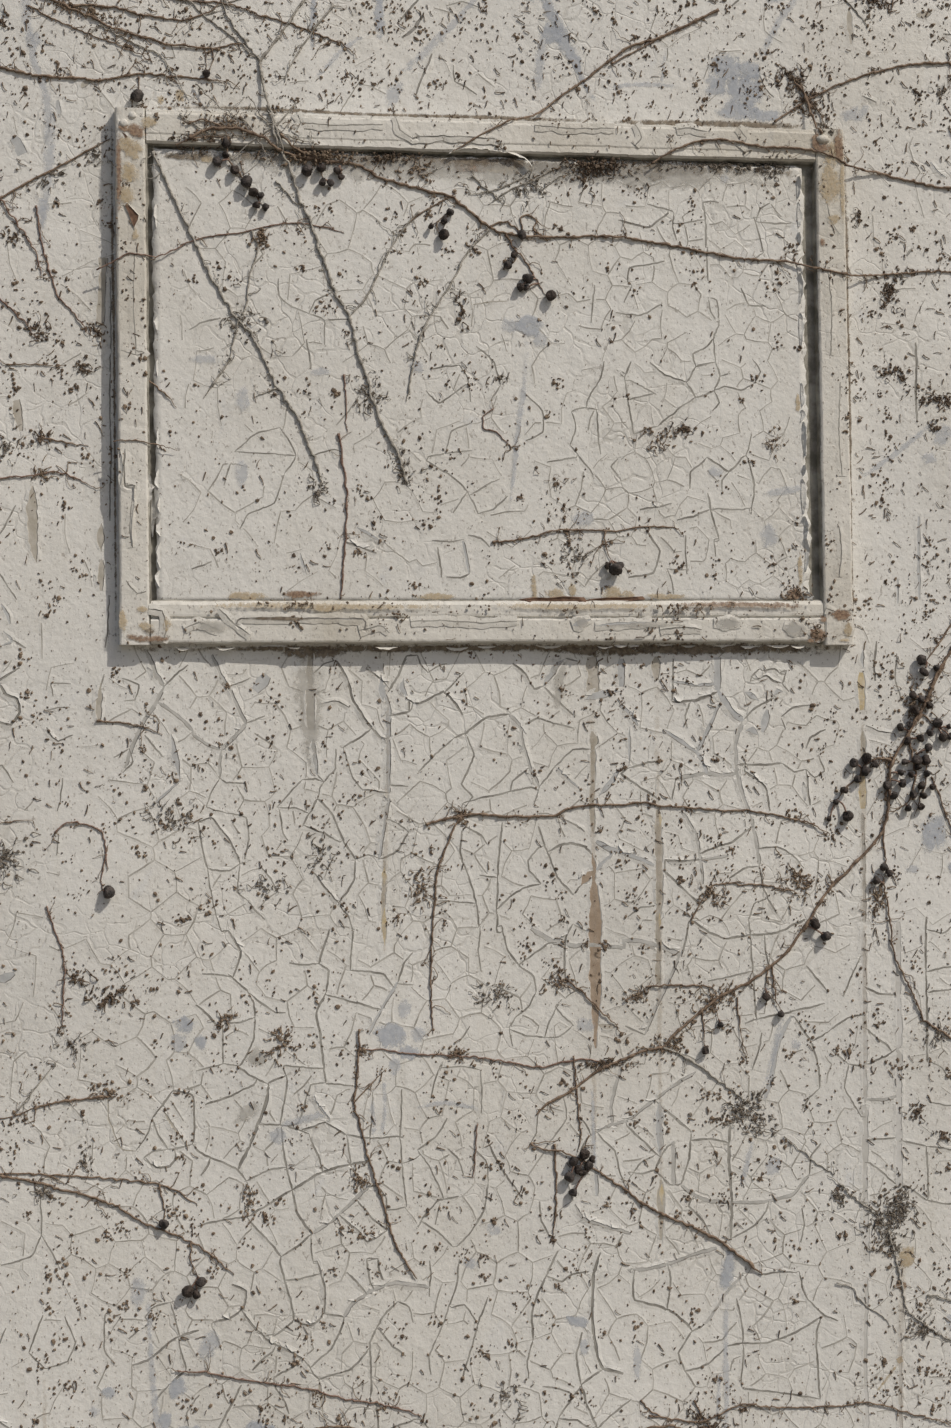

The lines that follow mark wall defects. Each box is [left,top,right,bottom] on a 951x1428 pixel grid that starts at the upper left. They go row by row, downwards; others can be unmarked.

crack [146,19,225,82]
crack [535,121,647,148]
crack [649,5,741,137]
crack [734,125,752,152]
crack [861,93,877,105]
crack [868,136,951,218]
crack [920,30,951,69]
crack [0,201,150,548]
crack [178,161,798,594]
crack [822,267,847,476]
crack [820,197,951,421]
crack [0,504,951,1428]